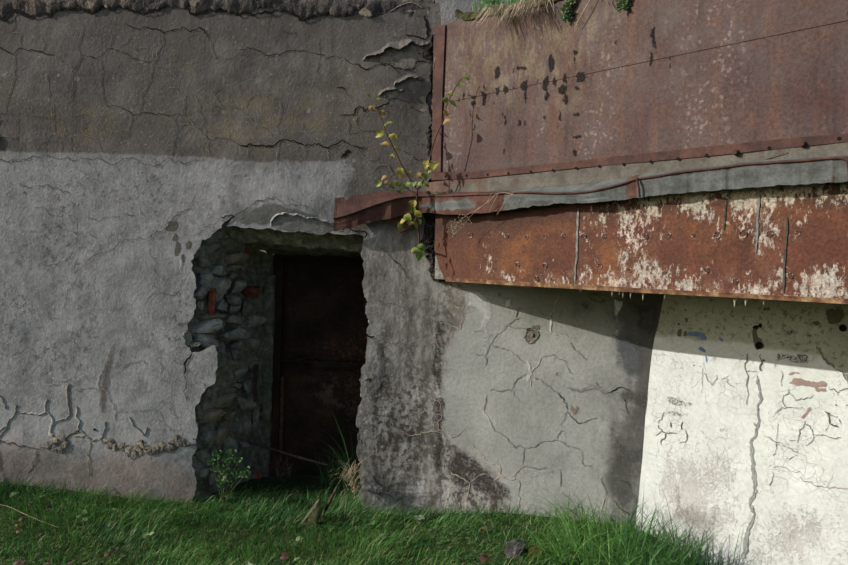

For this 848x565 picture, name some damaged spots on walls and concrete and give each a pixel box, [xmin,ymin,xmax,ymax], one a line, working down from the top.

crack [0,0,430,172]
flaking render [362,38,430,98]
crack [196,196,309,235]
spalling [238,204,334,235]
water stain [618,337,642,375]
crack [0,326,204,475]
water stain [432,321,510,498]
crack [364,293,631,514]
water stain [609,445,637,503]
water stain [621,391,648,407]
crack [657,413,688,443]
crack [701,340,848,565]